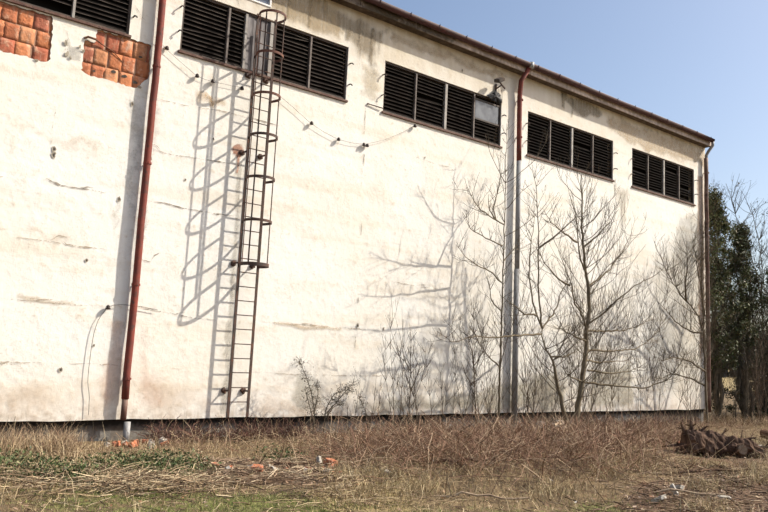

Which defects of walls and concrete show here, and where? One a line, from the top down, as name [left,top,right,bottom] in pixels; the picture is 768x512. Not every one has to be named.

spalling [0,1,53,62]
spalling [79,30,151,89]
rust [232,144,242,173]